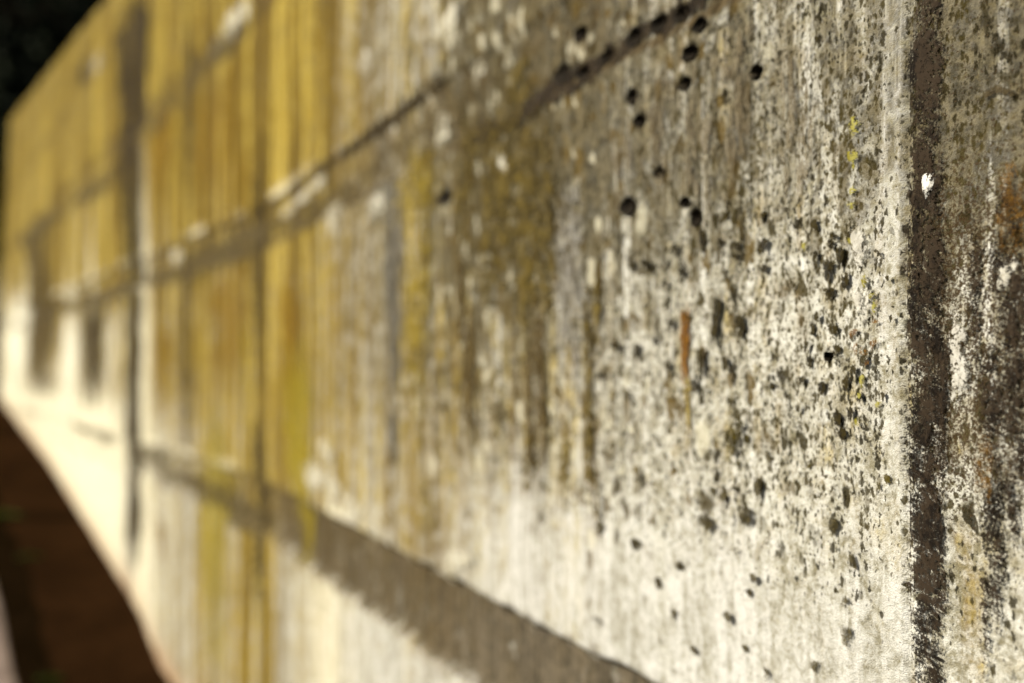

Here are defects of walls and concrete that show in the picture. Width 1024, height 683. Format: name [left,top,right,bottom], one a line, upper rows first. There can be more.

rust [680,308,691,442]
leakage [899,0,951,683]
leakage [967,188,1024,682]